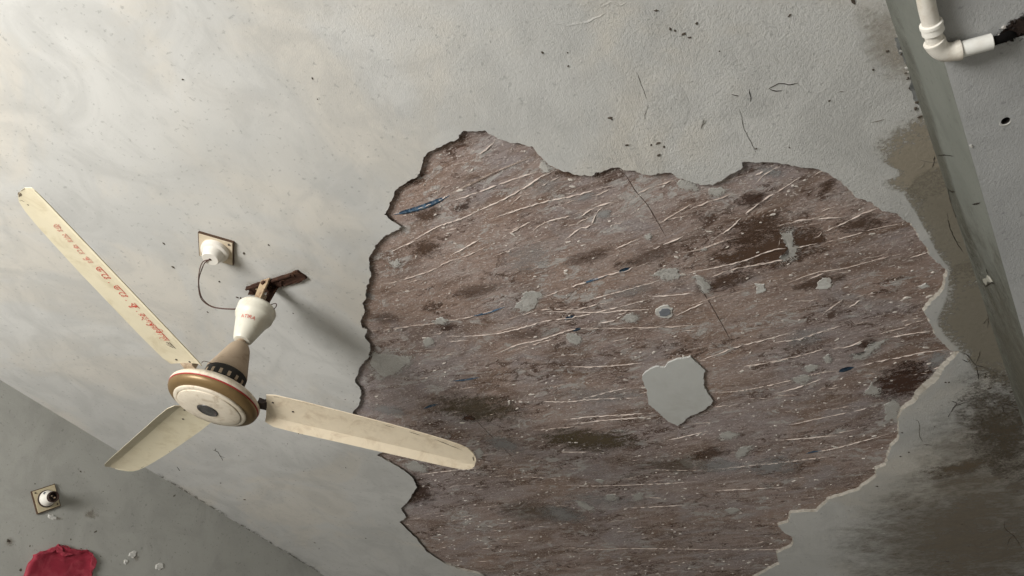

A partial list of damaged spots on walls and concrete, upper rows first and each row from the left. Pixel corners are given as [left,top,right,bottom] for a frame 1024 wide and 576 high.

spalling [353,130,959,576]
leakage [881,115,1024,576]